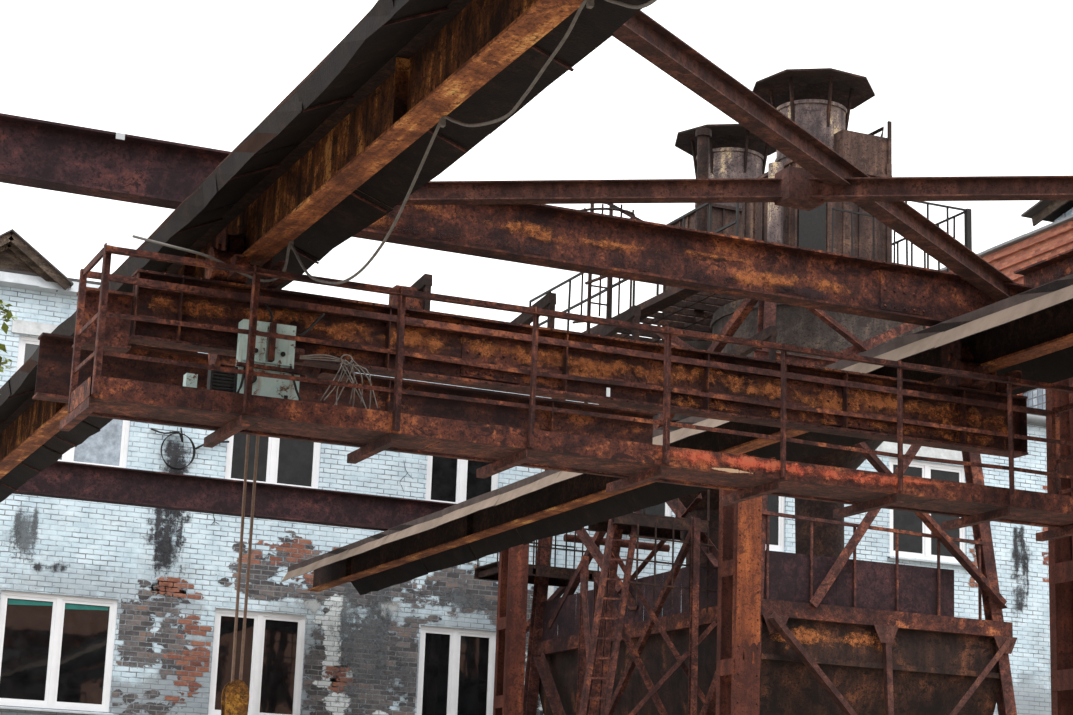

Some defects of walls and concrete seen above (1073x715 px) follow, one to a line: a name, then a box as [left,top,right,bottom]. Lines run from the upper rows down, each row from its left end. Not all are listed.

rust [385,329,443,353]
rust [464,339,781,398]
rust [796,389,1008,444]
damp [164,438,190,474]
damp [9,508,66,572]
damp [148,508,191,574]
rust [736,496,762,664]
damp [1012,527,1030,626]
peeling [111,576,212,715]
peeling [218,529,498,715]
peeling [524,586,534,684]
rust [775,626,826,644]